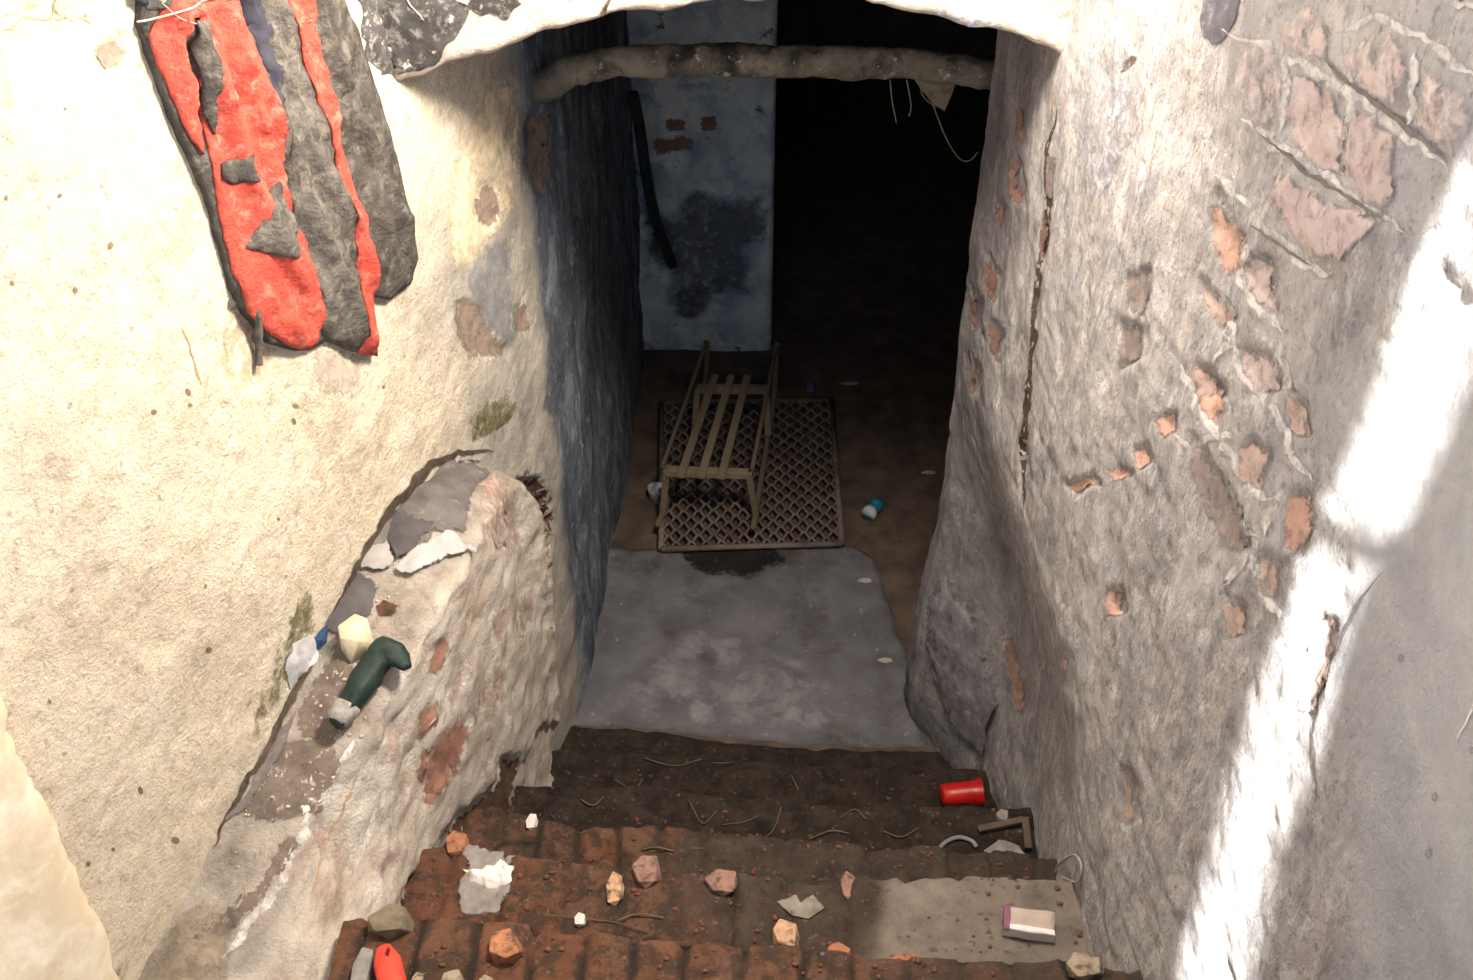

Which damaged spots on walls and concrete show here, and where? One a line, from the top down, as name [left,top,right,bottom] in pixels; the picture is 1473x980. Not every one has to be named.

flaking render [1452,0,1473,10]
crack [1018,109,1057,505]
flaking render [1117,272,1151,367]
flaking render [1174,3,1473,637]
flaking render [492,593,532,636]
flaking render [1105,591,1123,616]
flaking render [386,638,505,805]